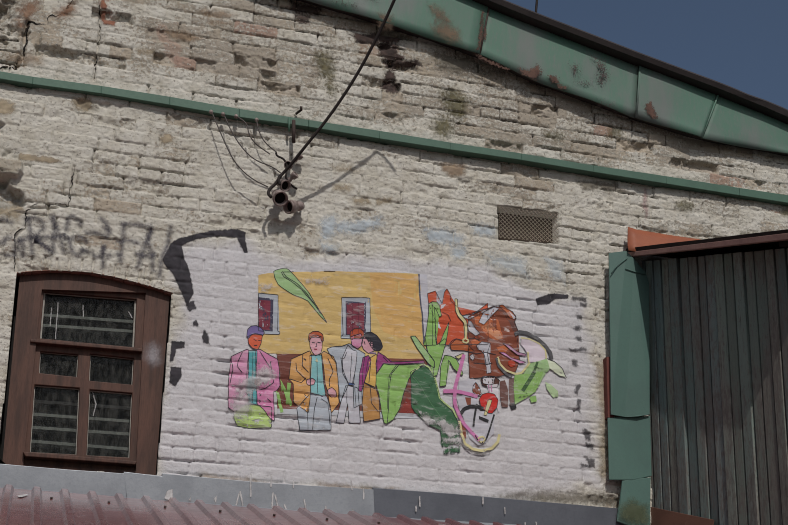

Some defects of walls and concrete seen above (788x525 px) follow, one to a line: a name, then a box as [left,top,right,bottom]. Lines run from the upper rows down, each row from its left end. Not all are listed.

crack [0,0,73,70]
spalling [100,0,115,26]
damp [353,33,423,93]
corrosion [475,10,566,89]
crack [14,167,75,271]